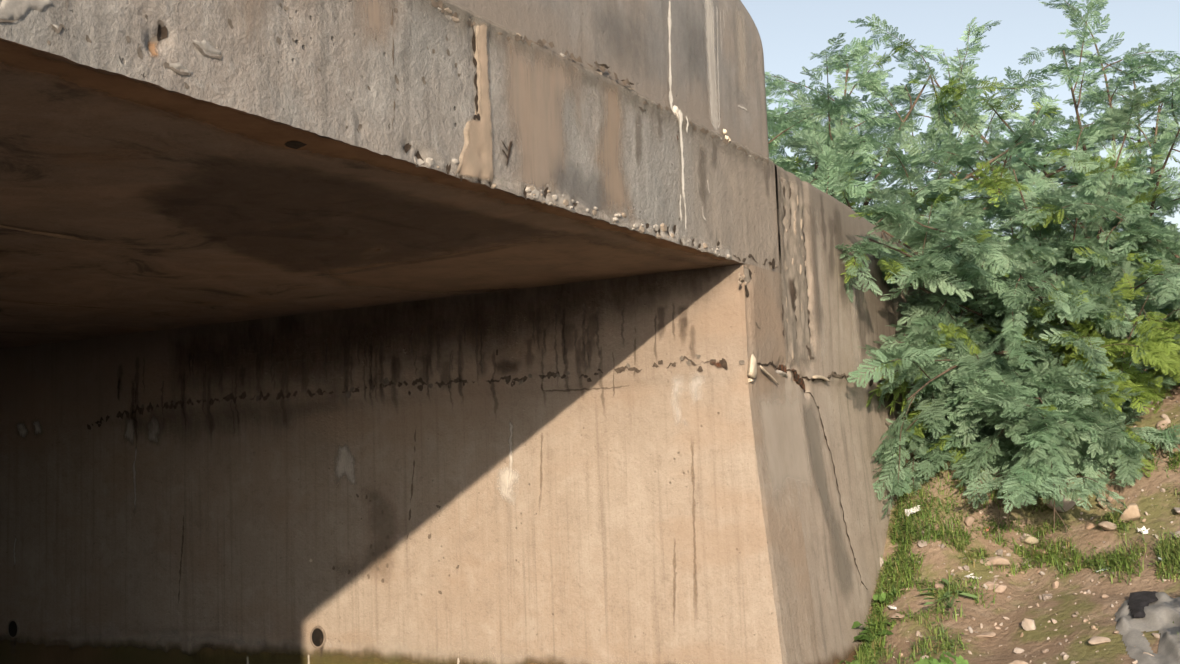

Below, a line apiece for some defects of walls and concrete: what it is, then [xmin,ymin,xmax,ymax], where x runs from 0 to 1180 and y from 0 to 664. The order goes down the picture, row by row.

water stain [603,1,689,229]
spalling [404,143,732,260]
water stain [176,235,714,376]
spalling [738,267,752,297]
crack [87,309,873,603]
water stain [0,630,475,664]